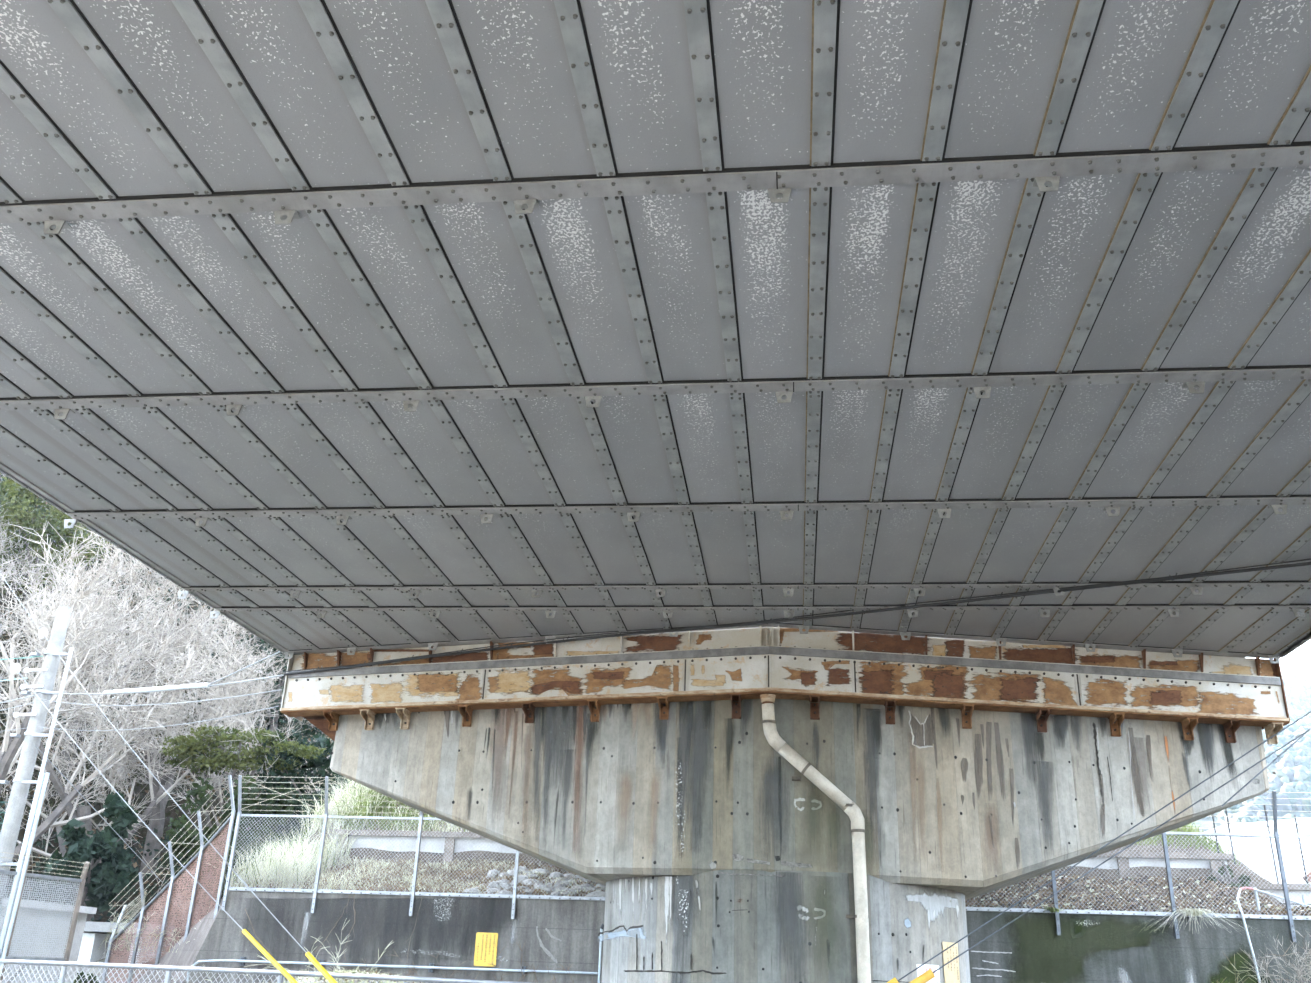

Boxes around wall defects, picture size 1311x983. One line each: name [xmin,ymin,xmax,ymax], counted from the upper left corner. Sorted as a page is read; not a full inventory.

leakage [376,713,397,726]
leakage [444,711,459,736]
rust [301,633,742,808]
leakage [534,705,597,834]
leakage [655,701,711,852]
leakage [726,699,752,773]
leakage [764,757,783,849]
leakage [857,704,881,836]
leakage [931,708,1080,836]
rust [780,628,1279,715]
leakage [1099,717,1153,820]
leakage [1178,722,1235,784]